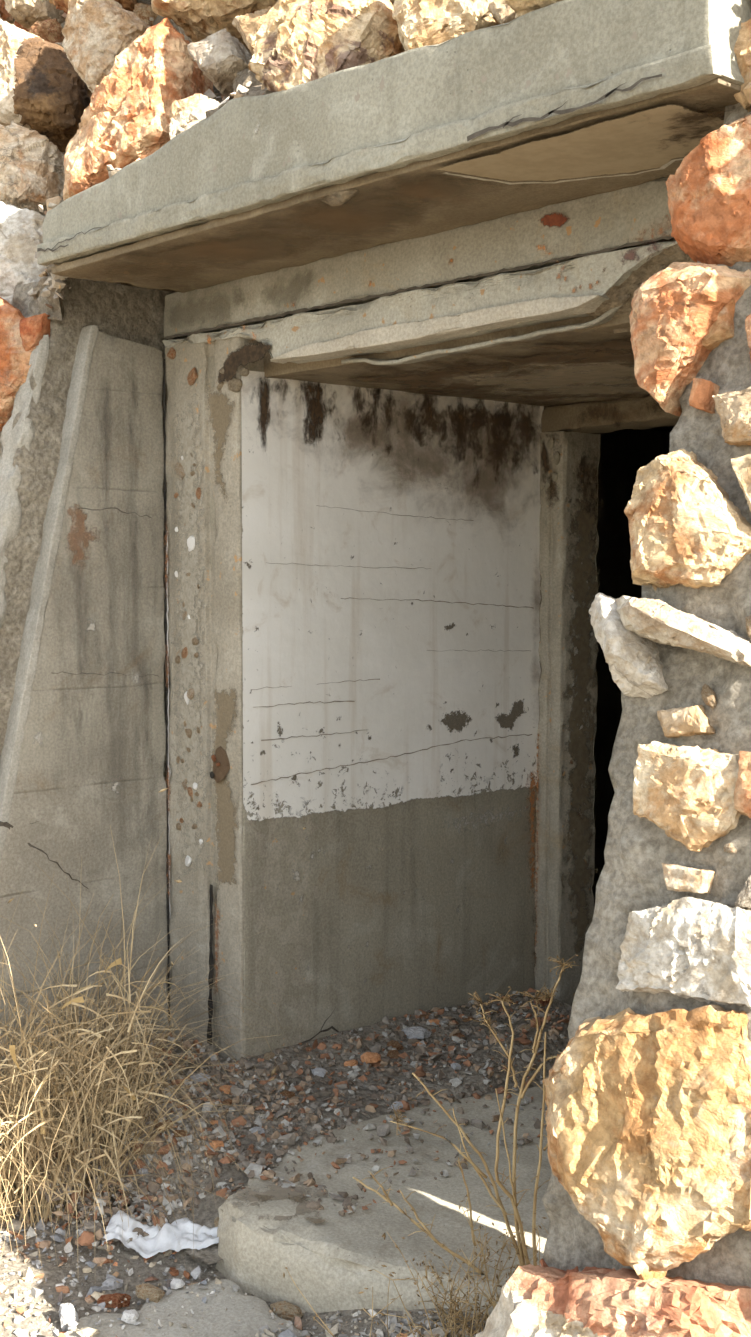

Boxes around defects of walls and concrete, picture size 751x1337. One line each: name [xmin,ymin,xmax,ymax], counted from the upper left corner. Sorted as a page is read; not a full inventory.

spalling [341,244,696,366]
leakage [258,378,270,447]
leakage [304,375,326,443]
leakage [347,337,647,509]
peeling [171,341,560,890]